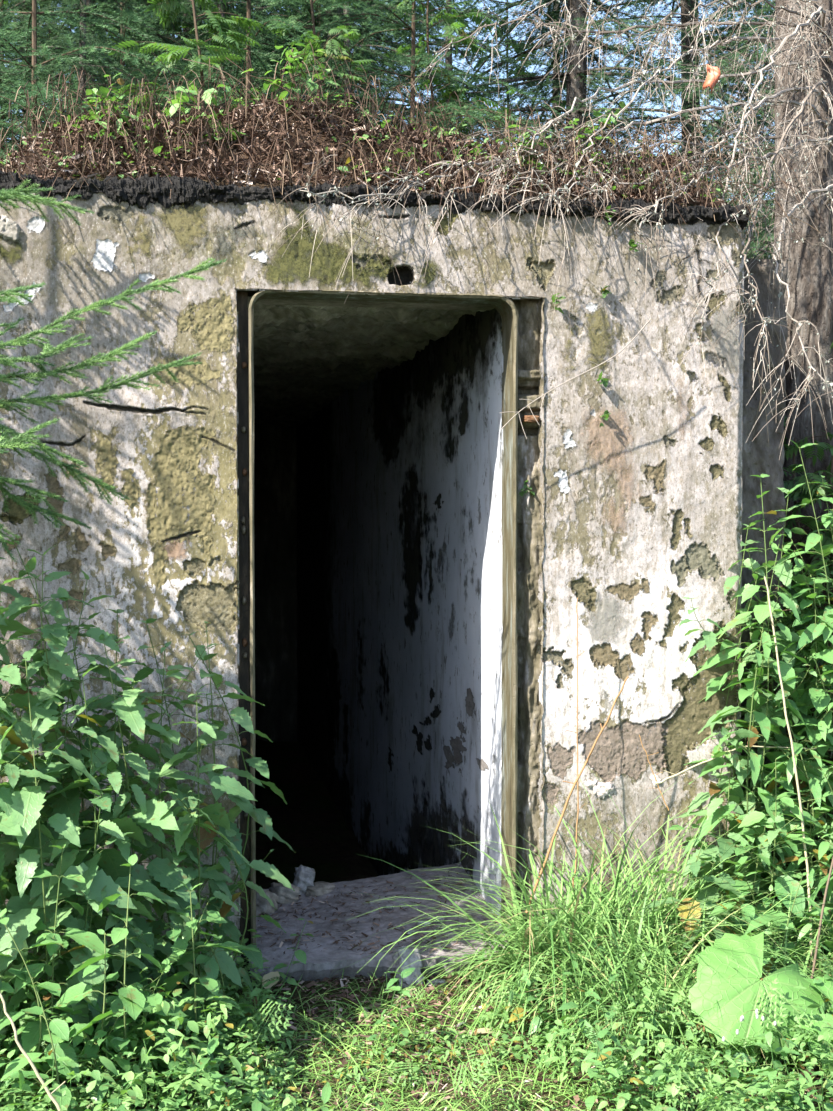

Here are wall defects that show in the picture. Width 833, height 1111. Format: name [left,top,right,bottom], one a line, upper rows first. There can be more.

water stain [290,204,311,233]
peeling [0,463,116,575]
crack [83,402,234,451]
peeling [97,427,240,631]
crack [163,530,202,543]
water stain [398,464,446,635]
water stain [368,308,503,466]
peeling [640,461,666,510]
peeling [699,415,727,454]
peeling [537,644,573,689]
peeling [543,509,740,805]
water stain [325,620,479,881]